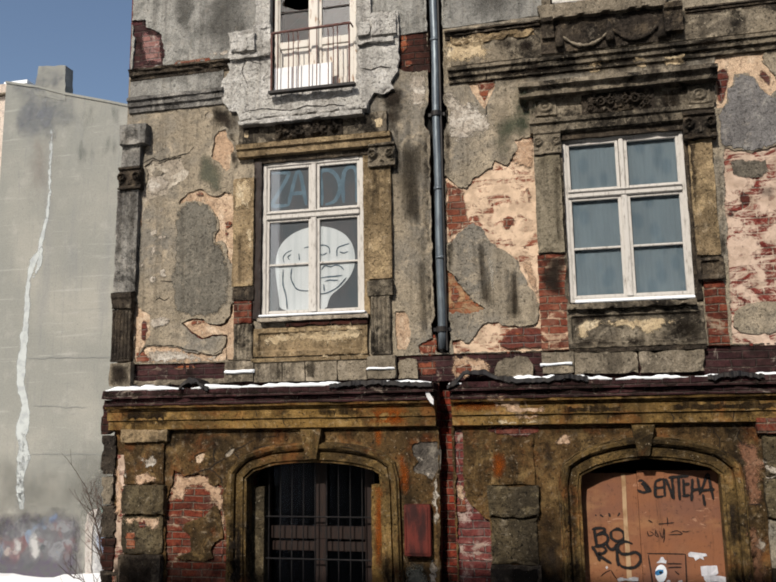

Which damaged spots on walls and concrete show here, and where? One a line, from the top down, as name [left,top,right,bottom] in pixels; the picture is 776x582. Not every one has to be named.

flaking render [132,20,165,69]
crack [245,104,344,112]
flaking render [398,27,430,109]
peeling [443,36,487,63]
peeling [445,80,495,142]
flaking render [714,51,776,108]
flaking render [180,179,252,263]
flaking render [444,137,548,379]
flaking render [723,146,776,346]
flaking render [136,456,156,484]
flaking render [115,469,226,582]
flaking render [454,427,492,582]